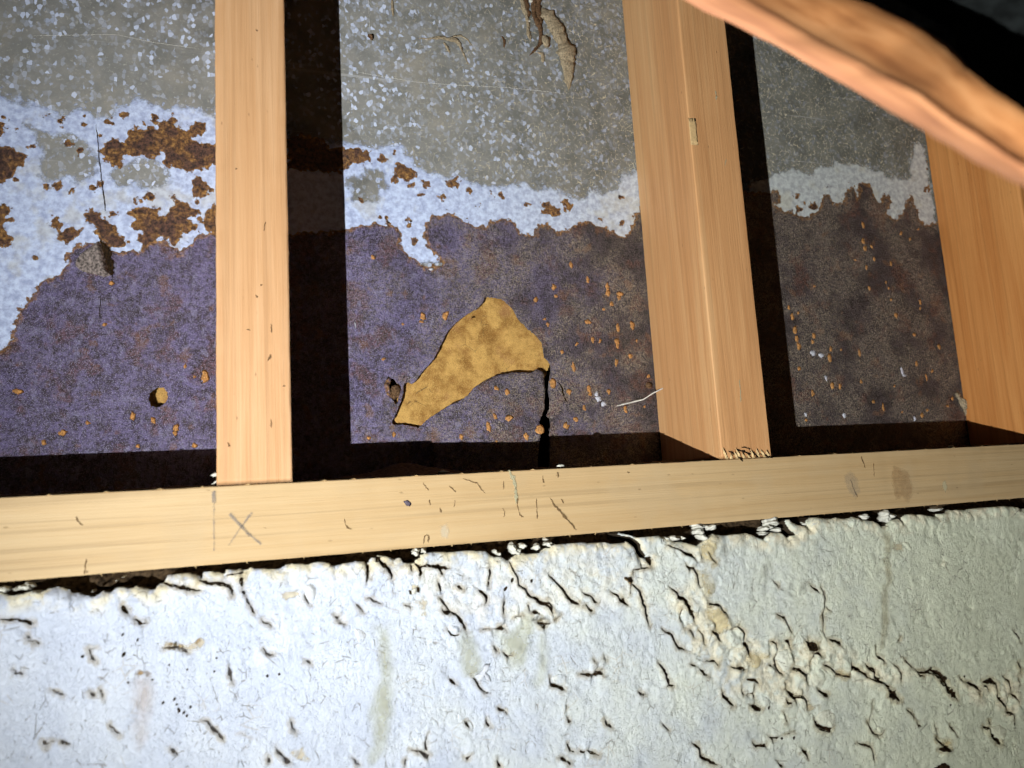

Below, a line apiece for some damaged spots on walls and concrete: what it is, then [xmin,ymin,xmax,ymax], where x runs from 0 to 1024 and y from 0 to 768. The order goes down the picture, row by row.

corrosion [0,90,217,495]
corrosion [743,142,970,457]
crack [163,571,272,627]
crack [356,556,466,630]
crack [0,618,39,644]
crack [162,645,188,653]
crack [479,545,1018,748]
crack [202,720,223,740]
crack [276,749,290,764]
crack [560,744,599,765]
crack [692,743,717,765]